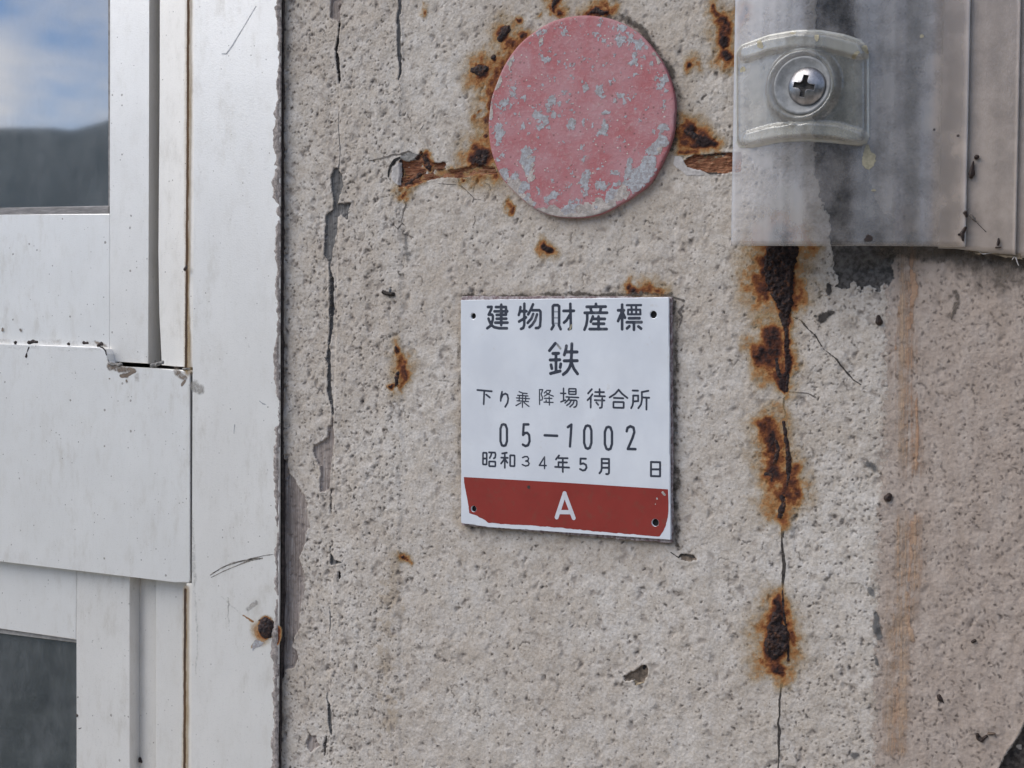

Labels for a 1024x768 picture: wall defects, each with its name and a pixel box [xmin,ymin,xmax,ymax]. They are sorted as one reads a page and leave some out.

crack [330,0,342,84]
rust [684,0,755,75]
rust [455,16,532,188]
rust [672,112,724,156]
crack [313,114,351,513]
rust [386,339,413,394]
rust [738,209,821,532]
leakage [864,196,1024,768]
crack [779,531,787,587]
rust [748,586,804,689]
crack [323,692,332,756]
crack [775,686,783,768]